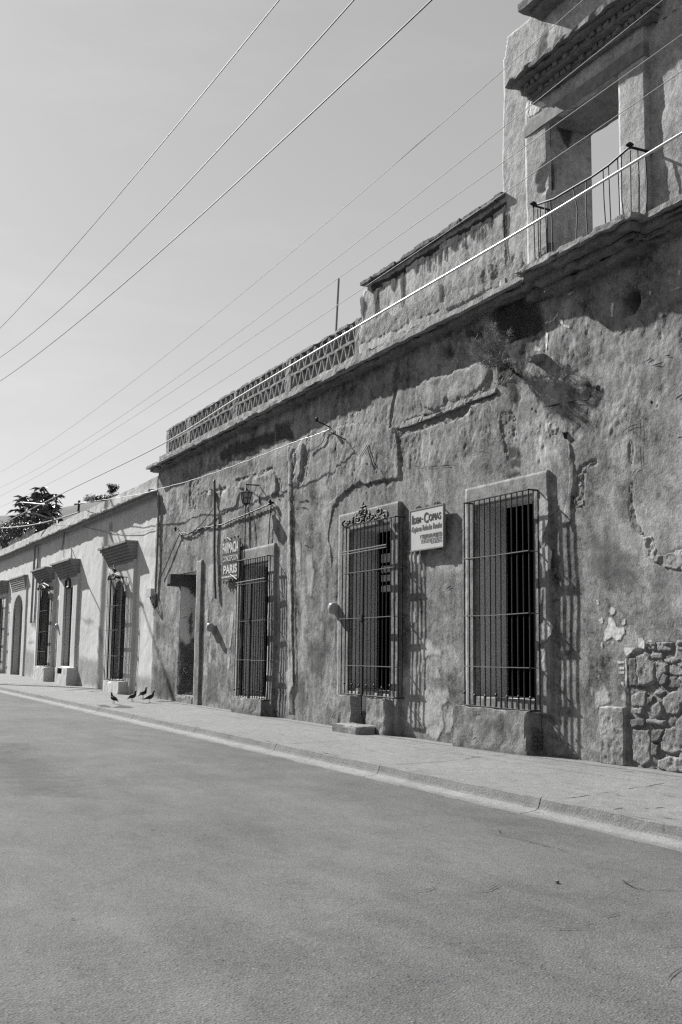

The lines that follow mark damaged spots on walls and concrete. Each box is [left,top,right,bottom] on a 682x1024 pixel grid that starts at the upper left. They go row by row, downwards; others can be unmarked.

spalling [629,484,682,570]
flaking render [591,600,682,773]